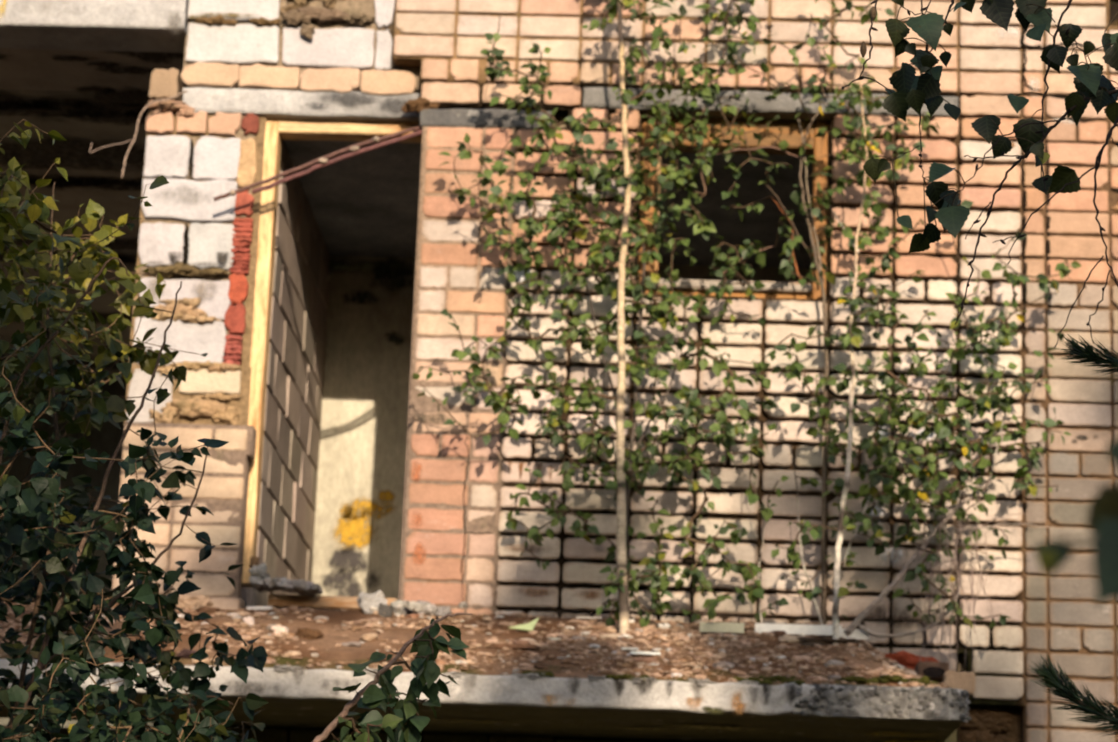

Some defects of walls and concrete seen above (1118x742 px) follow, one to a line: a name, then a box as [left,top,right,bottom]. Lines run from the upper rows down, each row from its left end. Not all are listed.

spalling [1109,0,1118,26]
spalling [794,684,1016,742]